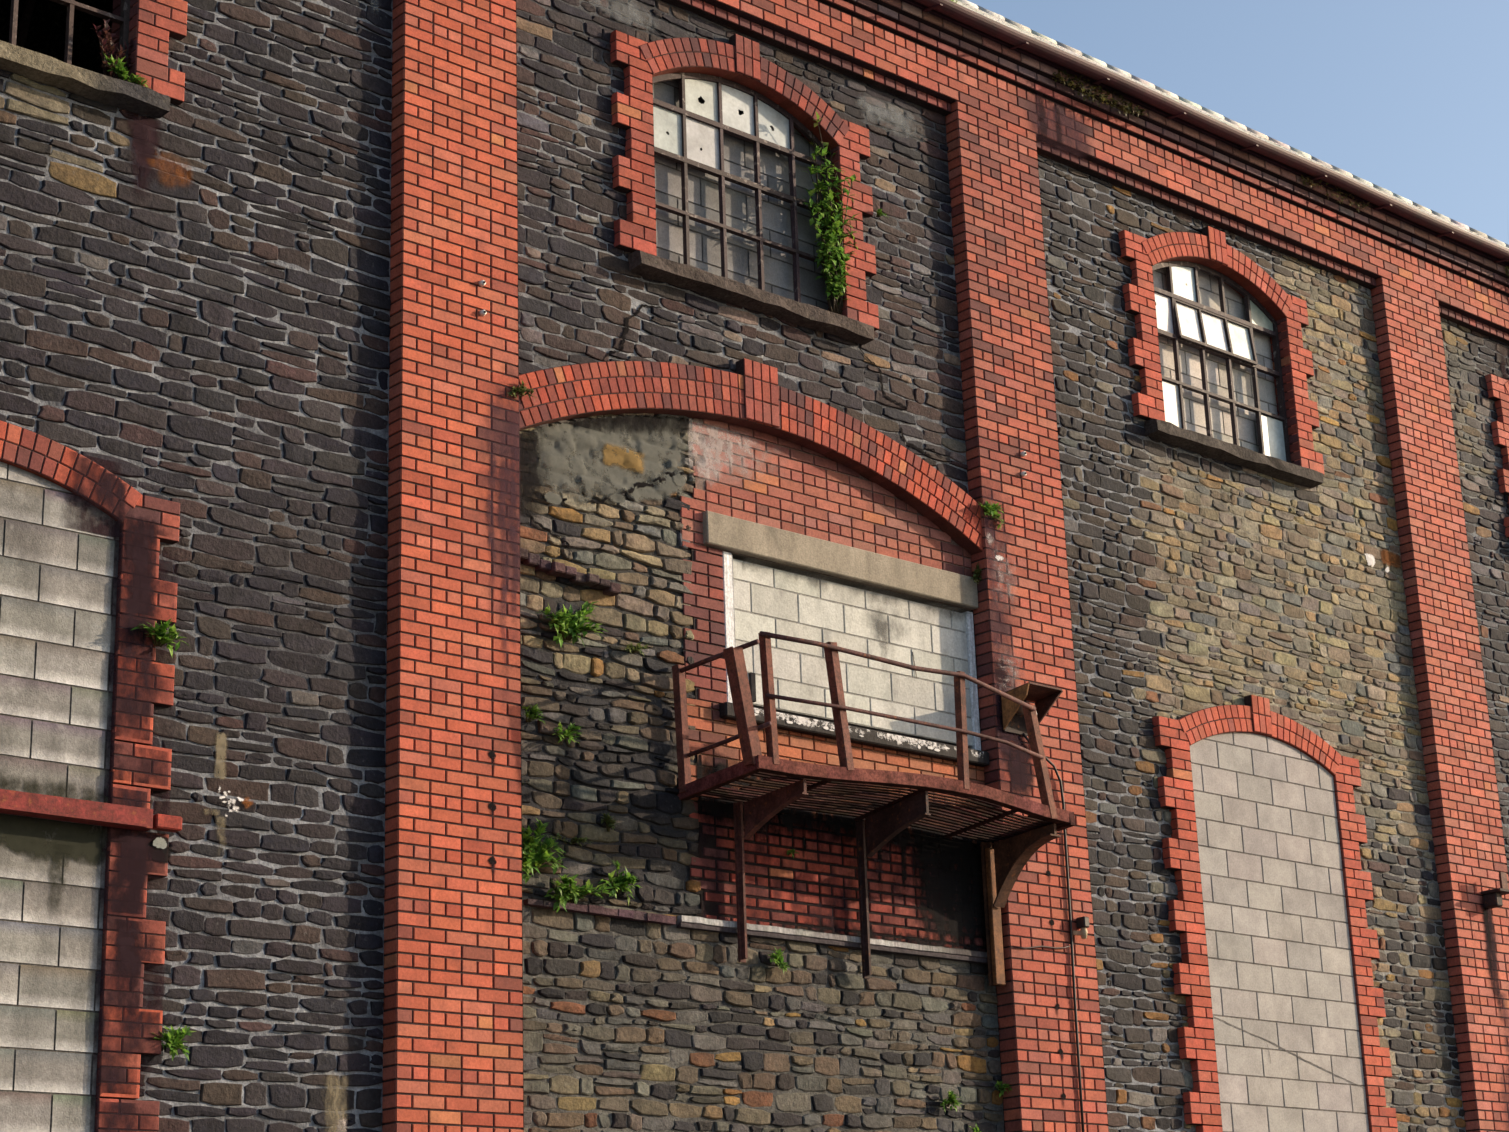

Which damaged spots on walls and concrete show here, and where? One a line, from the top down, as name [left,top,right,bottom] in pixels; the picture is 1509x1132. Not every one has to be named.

damp [488,396,520,605]
flaking render [519,415,689,518]
damp [0,780,109,802]
damp [0,813,151,984]